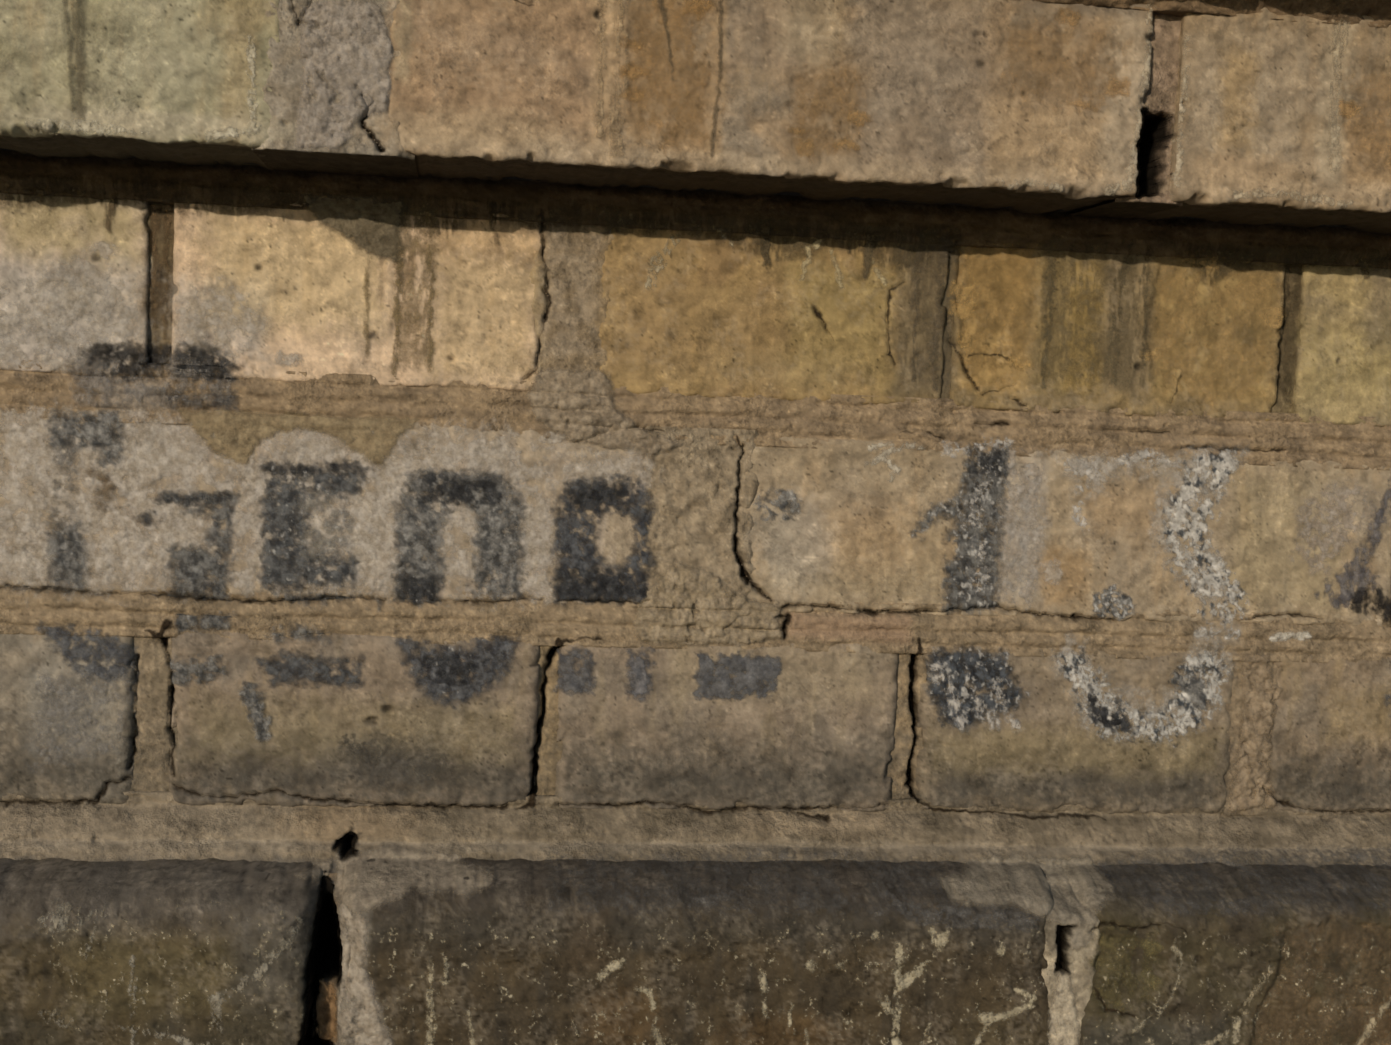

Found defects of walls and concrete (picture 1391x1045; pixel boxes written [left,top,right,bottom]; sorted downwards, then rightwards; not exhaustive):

crack [361,116,385,152]
crack [0,436,1112,822]